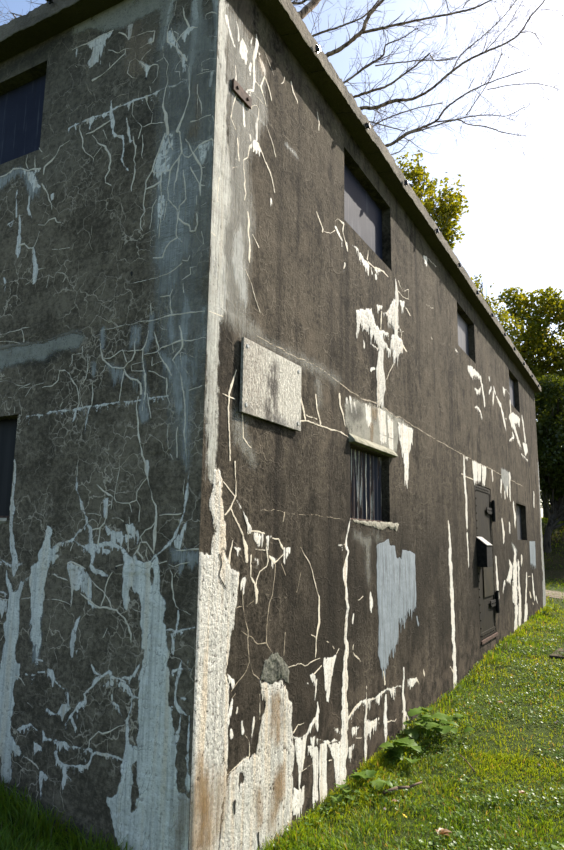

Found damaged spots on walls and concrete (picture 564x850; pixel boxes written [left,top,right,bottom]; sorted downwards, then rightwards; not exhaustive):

damp [0,24,188,284]
crack [0,370,64,413]
damp [70,616,80,658]
crack [17,664,140,794]
crack [53,396,192,577]
damp [111,616,166,838]
damp [133,555,159,606]
crack [165,610,195,743]
spalling [261,651,290,685]
crack [219,370,360,698]
crack [352,592,373,624]
spalling [353,519,399,531]